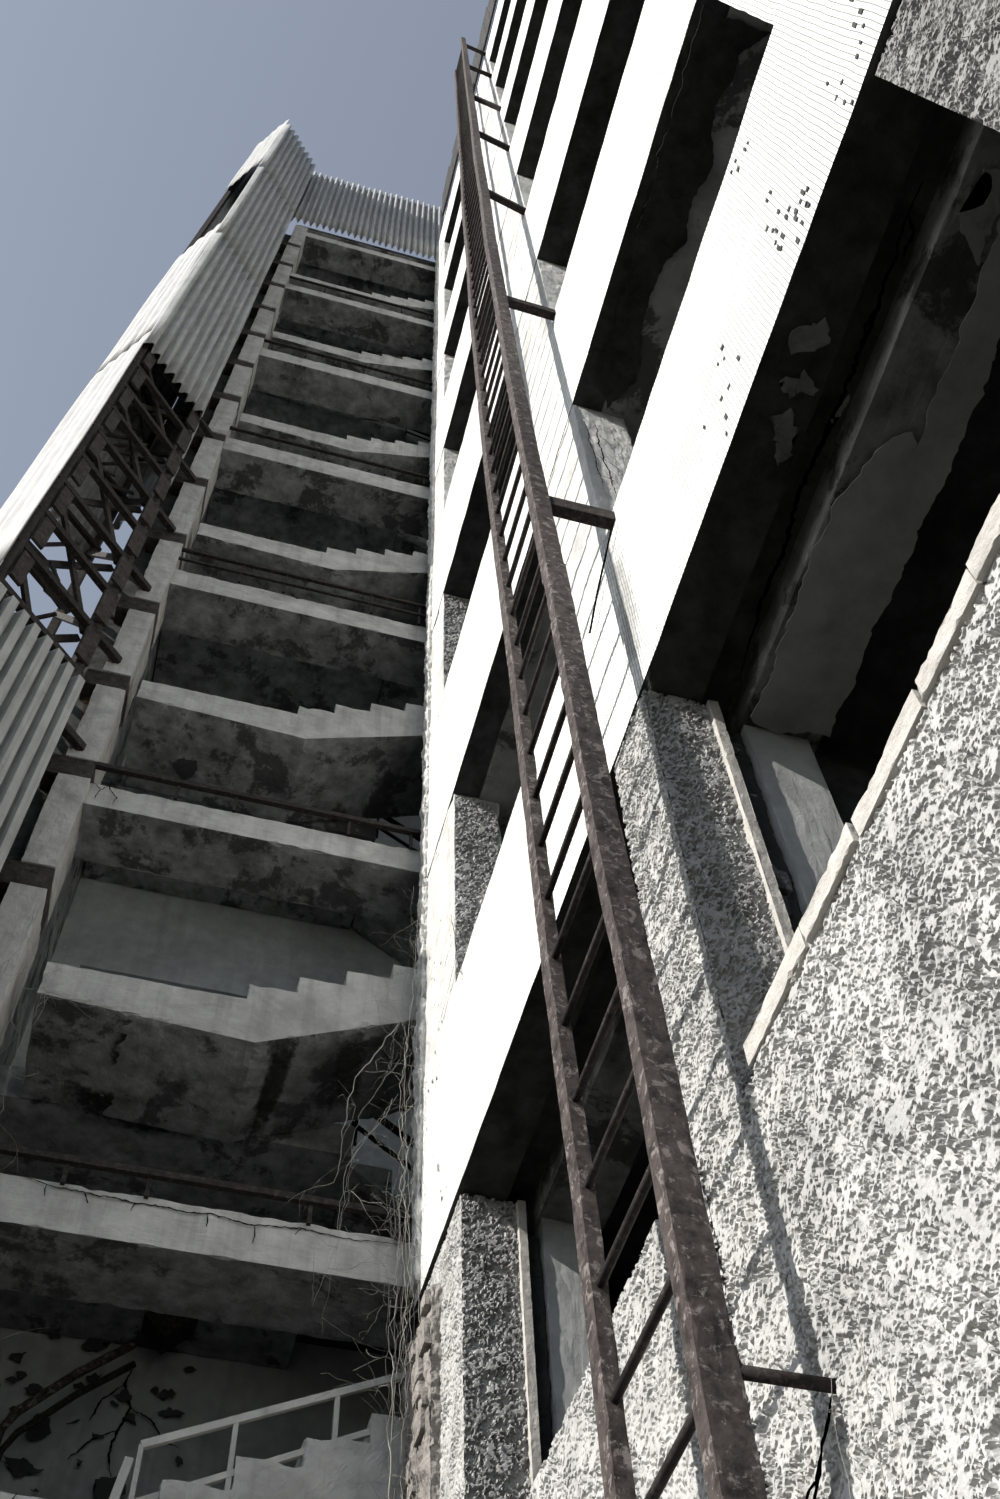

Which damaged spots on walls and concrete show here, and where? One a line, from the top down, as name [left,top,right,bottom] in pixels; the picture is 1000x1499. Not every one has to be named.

flaking render [725,168,1000,934]
water stain [67,1080,175,1134]
water stain [252,1041,295,1133]
water stain [328,1032,365,1112]
crack [67,1370,178,1477]
crack [805,1388,834,1499]